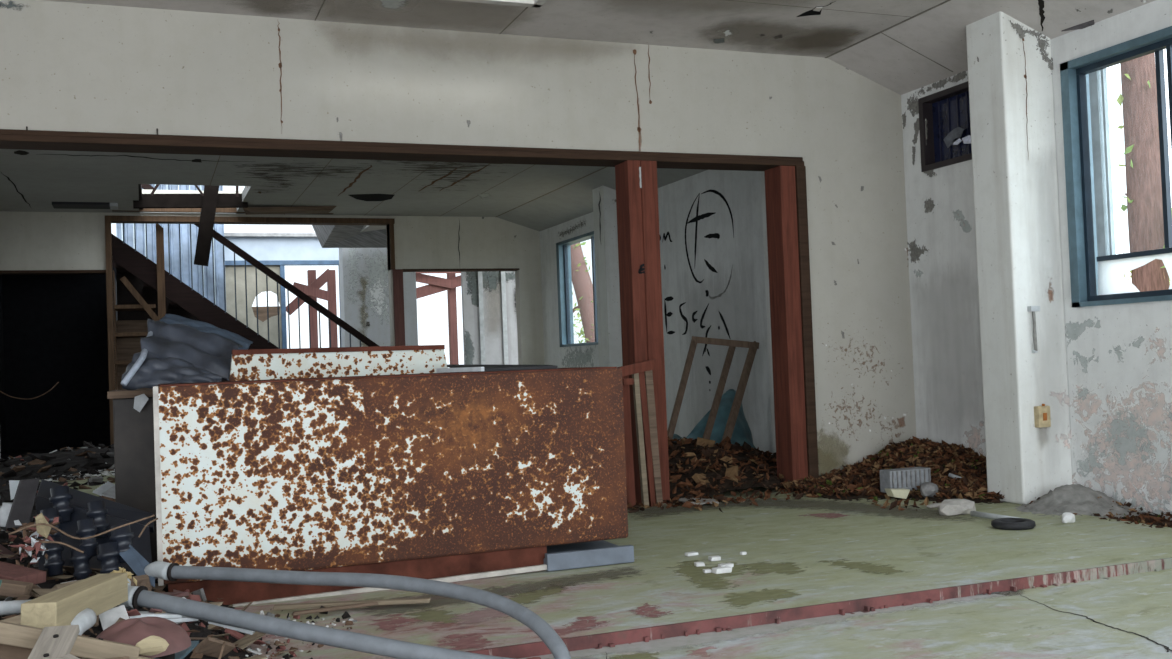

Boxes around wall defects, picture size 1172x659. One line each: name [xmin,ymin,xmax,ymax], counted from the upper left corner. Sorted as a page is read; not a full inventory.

crack [276,22,284,125]
crack [633,45,652,148]
peeling [901,71,967,177]
crack [1022,0,1045,157]
peeling [905,232,929,278]
peeling [922,198,935,213]
peeling [822,329,906,446]
peeling [1050,318,1172,519]
crack [1023,596,1172,652]